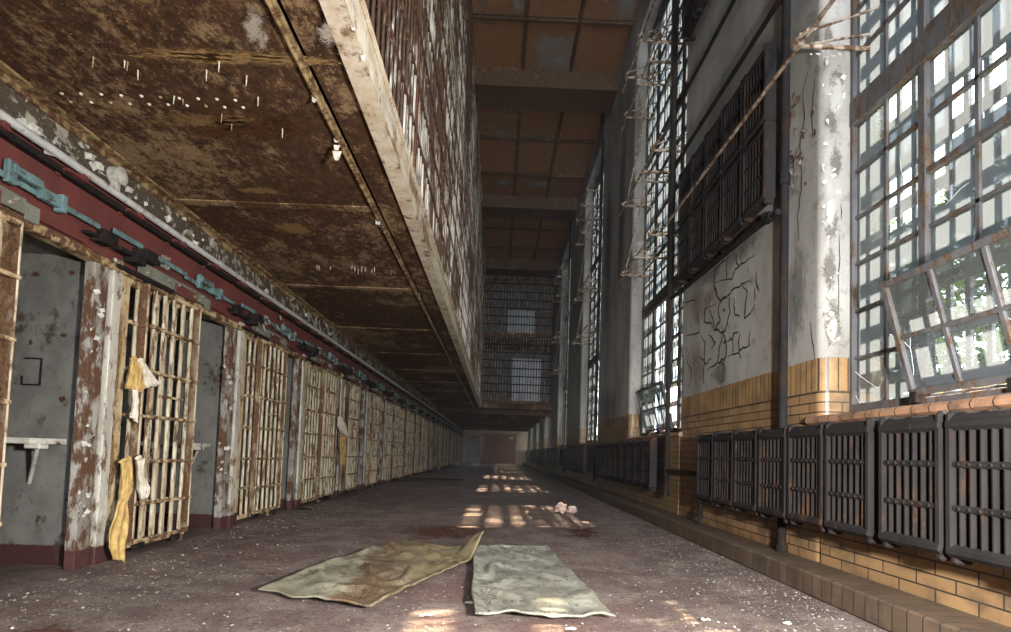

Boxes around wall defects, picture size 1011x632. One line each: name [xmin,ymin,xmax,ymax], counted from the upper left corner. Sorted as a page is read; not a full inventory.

crack [679,253,760,384]
spalling [789,22,847,351]